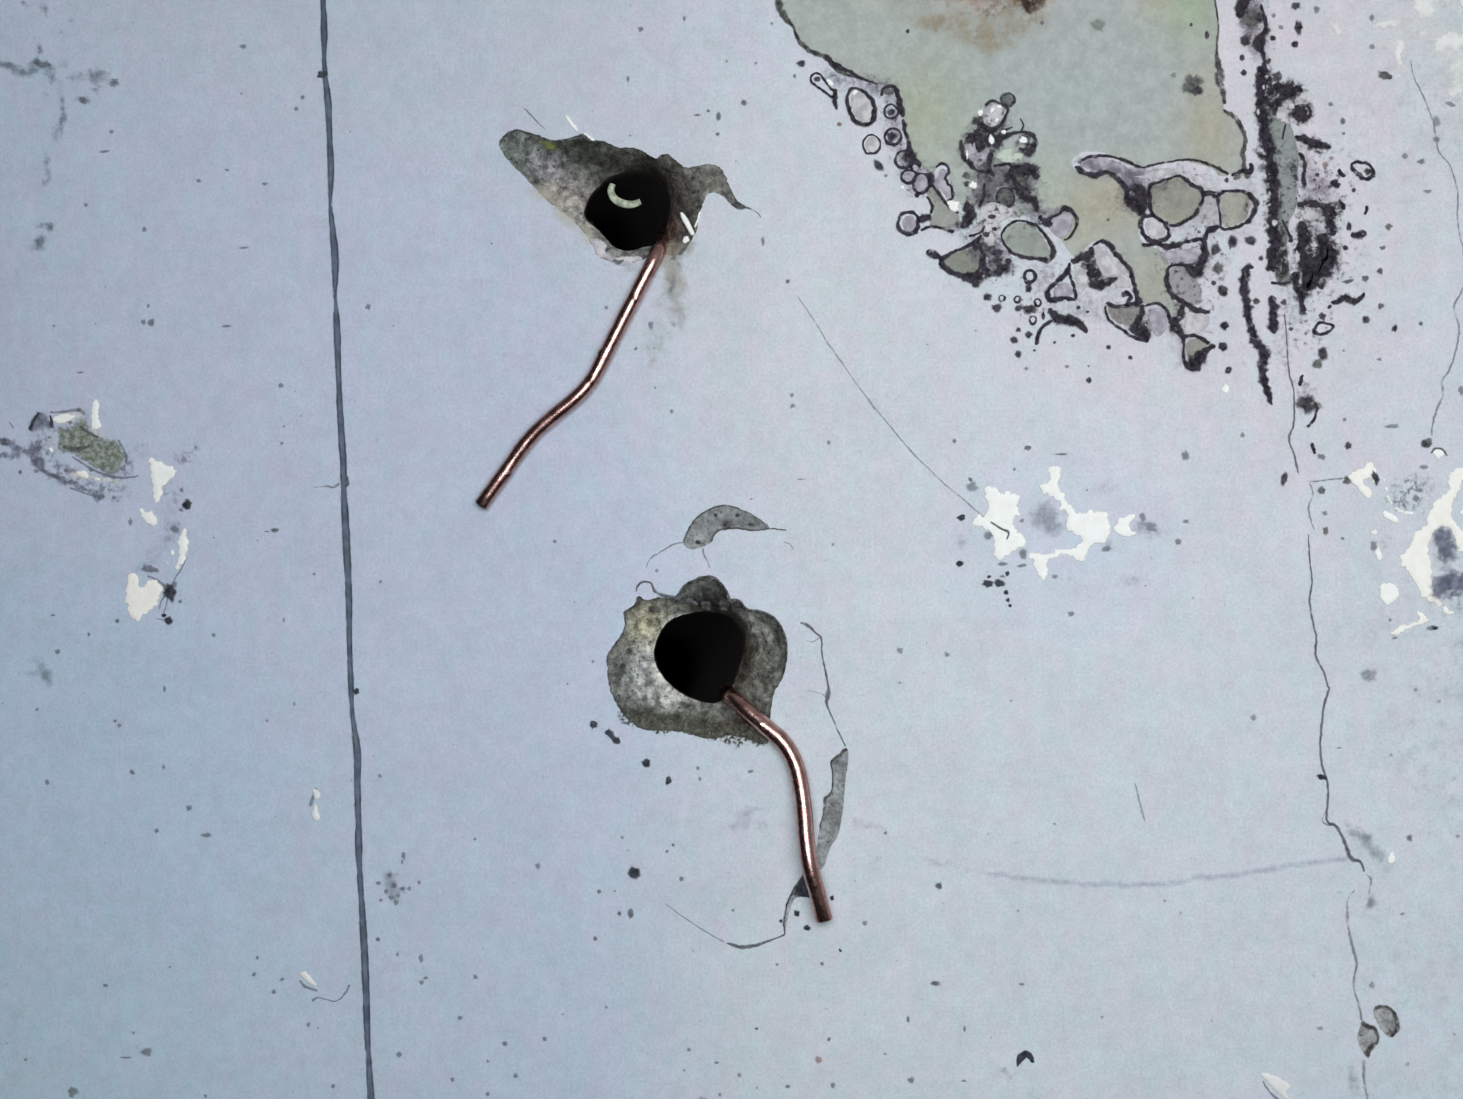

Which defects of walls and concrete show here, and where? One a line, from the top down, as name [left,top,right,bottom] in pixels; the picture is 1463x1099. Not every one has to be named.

peeling [1373,0,1463,106]
spalling [499,110,761,266]
peeling [775,0,1250,327]
peeling [1265,86,1299,287]
peeling [1185,339,1207,357]
peeling [0,399,192,624]
spalling [606,505,793,747]
peeling [957,466,1155,607]
crack [1284,313,1372,1020]
peeling [1348,462,1463,639]